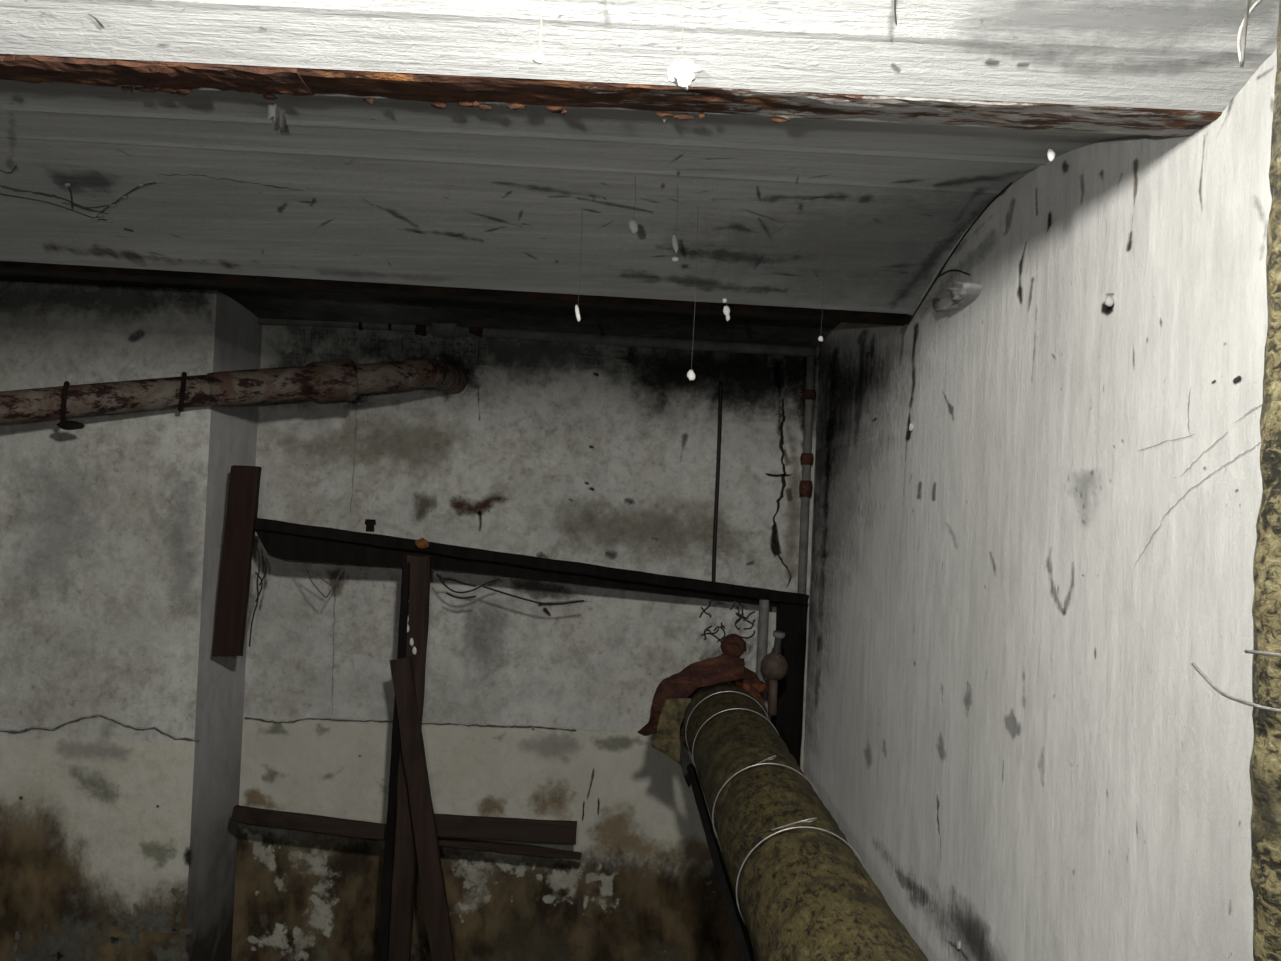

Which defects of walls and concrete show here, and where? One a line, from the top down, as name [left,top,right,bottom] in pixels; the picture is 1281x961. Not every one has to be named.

corrosion [431,101,527,111]
corrosion [546,105,568,115]
corrosion [655,111,707,120]
crack [747,398,792,588]
crack [0,715,200,741]
leakage [0,796,191,961]
leakage [231,826,385,961]
leakage [439,815,744,961]